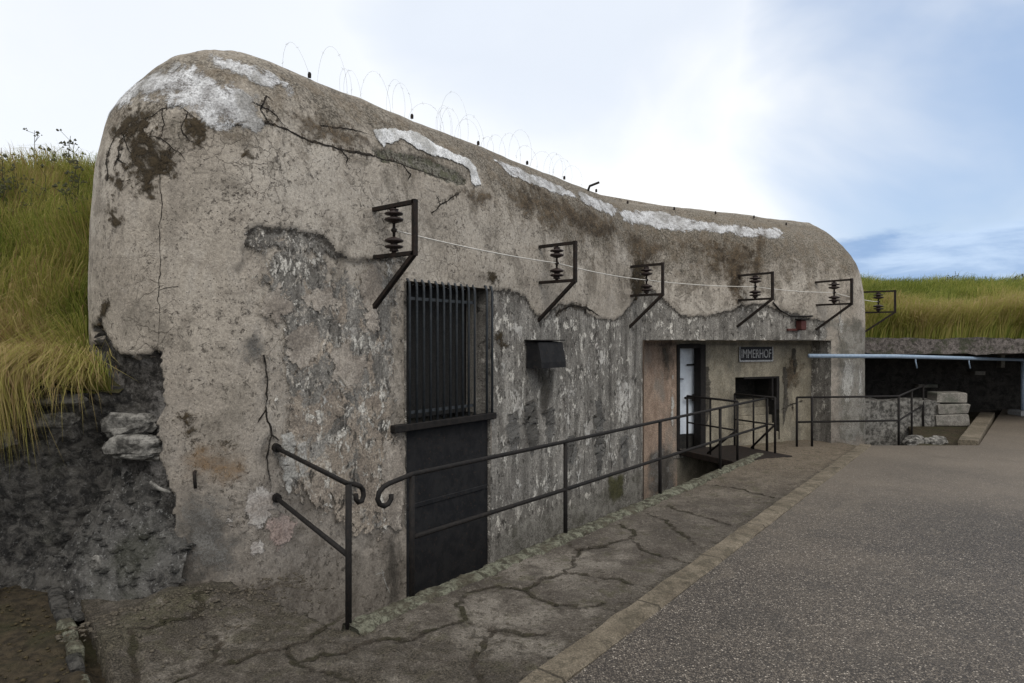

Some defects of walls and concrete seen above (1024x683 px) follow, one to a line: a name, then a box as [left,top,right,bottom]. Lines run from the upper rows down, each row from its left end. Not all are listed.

crack [105,89,462,349]
water stain [494,159,617,216]
spalling [93,293,200,528]
crack [258,354,279,493]
spalling [226,225,407,557]
spalling [479,271,827,563]
crack [127,506,731,683]